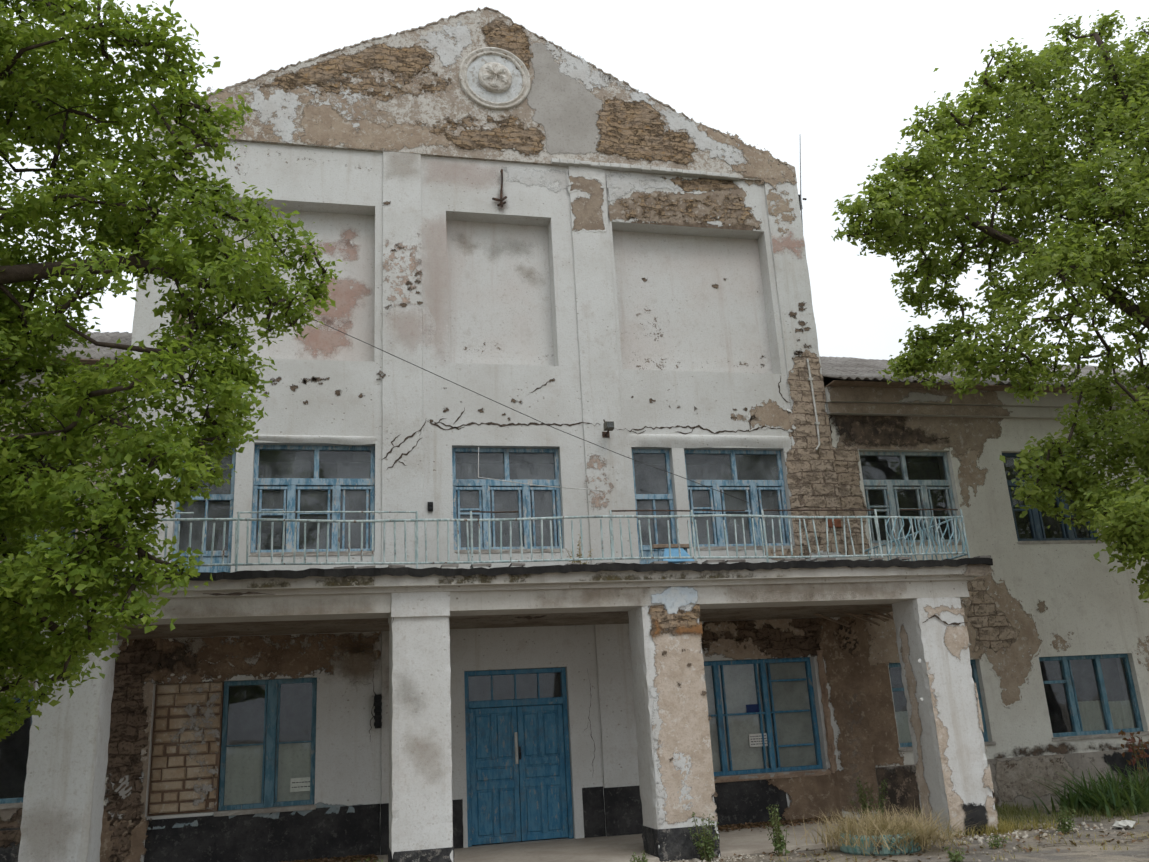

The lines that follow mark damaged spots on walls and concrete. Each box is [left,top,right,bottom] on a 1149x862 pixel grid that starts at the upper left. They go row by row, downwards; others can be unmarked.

flaking render [205,16,805,255]
crack [383,377,791,469]
spalling [730,302,1013,561]
spalling [0,808,22,848]
spalling [100,631,381,862]
peeling [648,586,1075,835]
spalling [924,564,1074,709]
peeling [1089,741,1149,778]